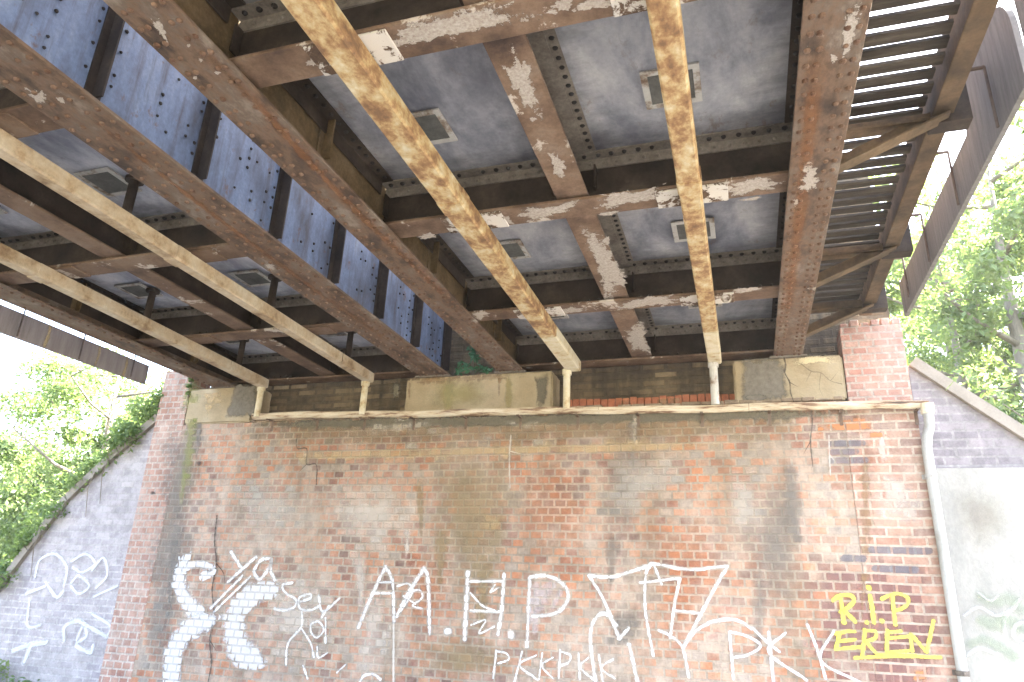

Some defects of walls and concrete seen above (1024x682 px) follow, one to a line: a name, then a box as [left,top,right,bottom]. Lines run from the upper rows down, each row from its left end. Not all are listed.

peeling [393,0,611,50]
peeling [502,43,543,122]
peeling [518,200,578,223]
peeling [547,153,567,178]
peeling [594,183,666,216]
peeling [728,162,820,207]
peeling [581,225,679,311]
peeling [624,321,651,355]
crack [784,358,837,476]
crack [296,439,318,485]
crack [208,515,225,682]